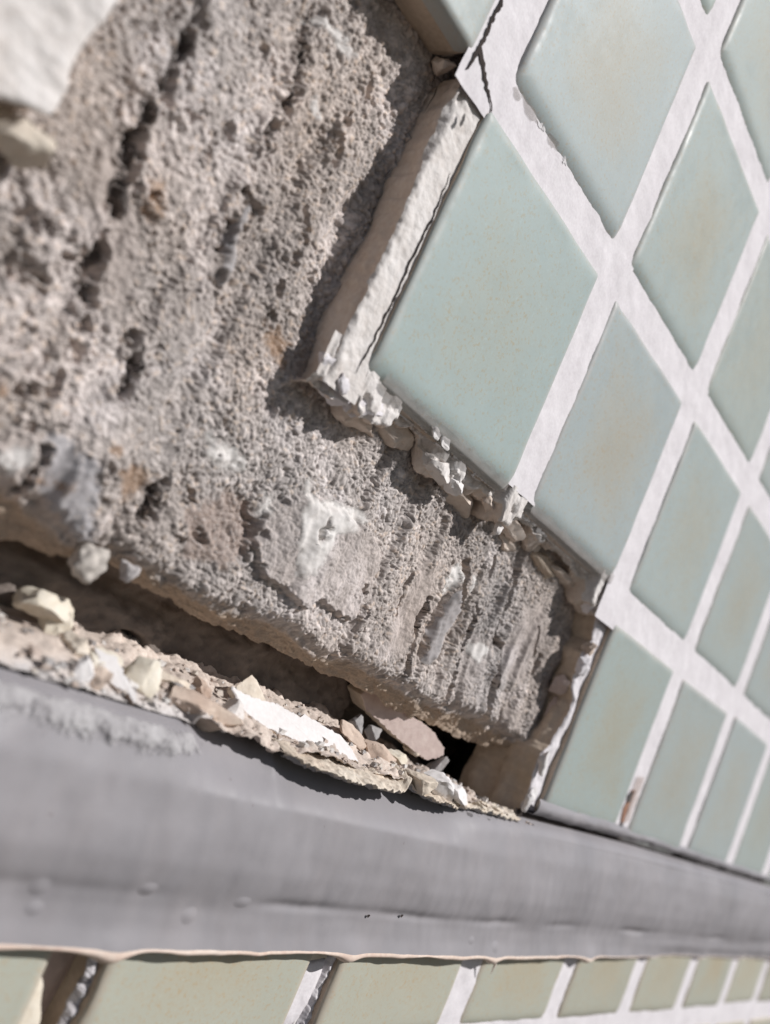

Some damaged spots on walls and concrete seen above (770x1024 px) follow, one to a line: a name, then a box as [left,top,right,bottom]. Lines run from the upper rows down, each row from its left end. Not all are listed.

crack [467,0,503,113]
spalling [0,0,610,826]
rust [620,790,636,827]